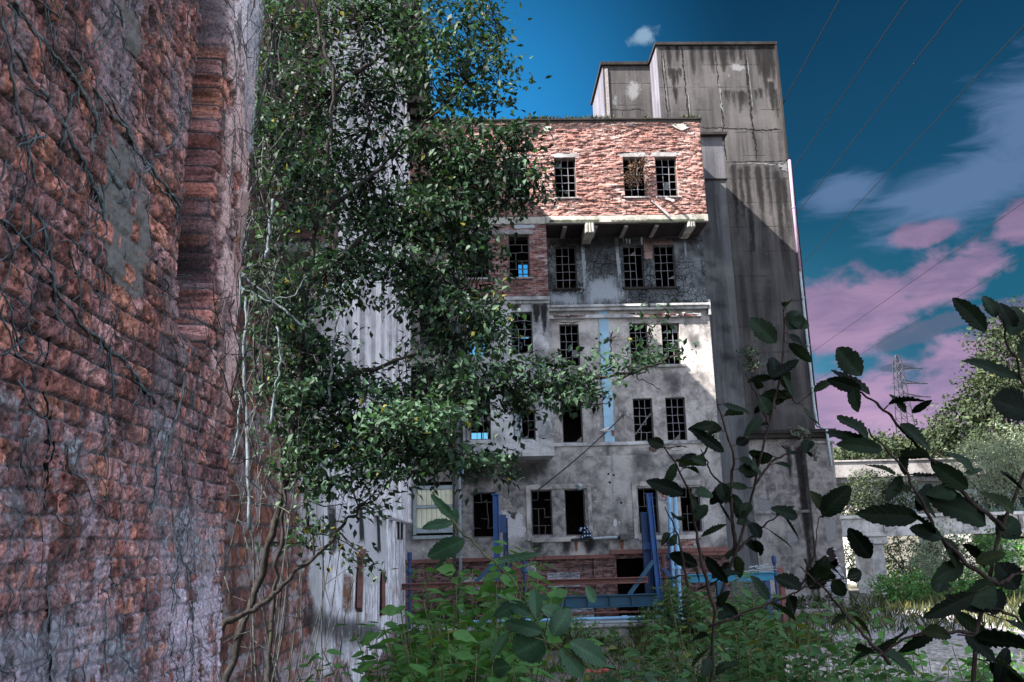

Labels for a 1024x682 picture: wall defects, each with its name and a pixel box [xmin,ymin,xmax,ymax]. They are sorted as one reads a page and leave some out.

crack [611,46,785,165]
water stain [666,46,745,103]
water stain [725,46,778,112]
water stain [731,165,788,244]